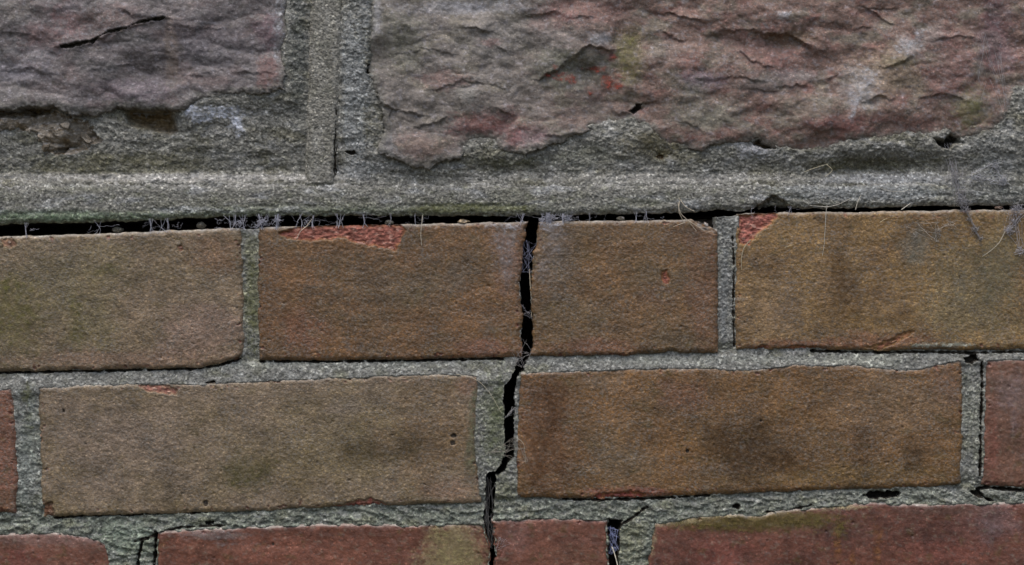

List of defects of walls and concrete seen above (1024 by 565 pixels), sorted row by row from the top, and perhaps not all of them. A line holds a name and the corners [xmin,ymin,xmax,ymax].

crack [60,16,166,48]
spalling [279,225,406,251]
spalling [737,195,792,245]
crack [0,205,1024,565]